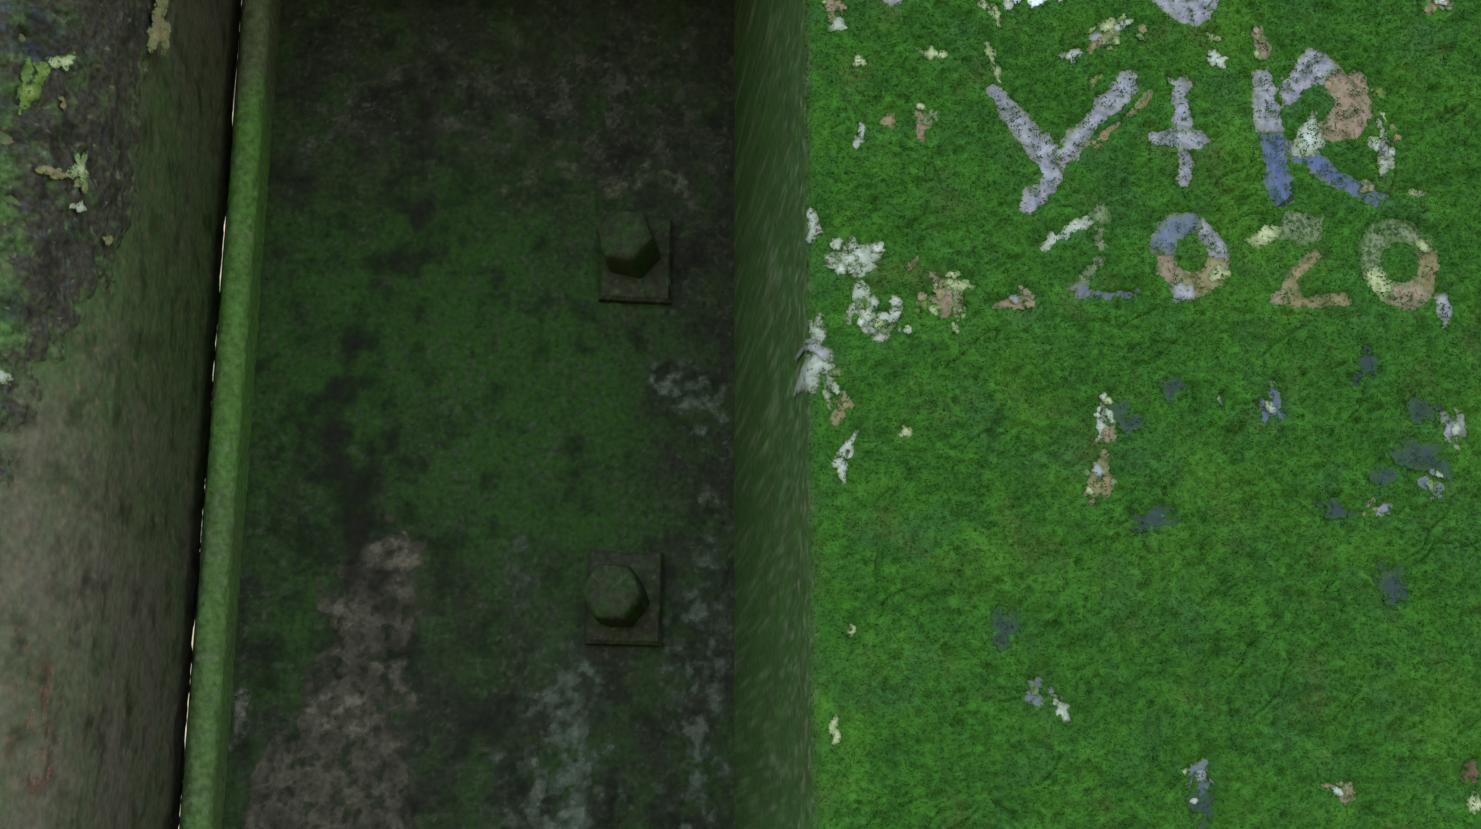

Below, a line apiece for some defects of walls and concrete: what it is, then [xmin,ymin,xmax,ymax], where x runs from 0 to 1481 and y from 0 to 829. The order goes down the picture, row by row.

flaking render [821,0,848,32]
peeling [979,0,1061,11]
peeling [1152,0,1219,27]
flaking render [1057,19,1147,63]
peeling [1206,49,1229,69]
flaking render [1251,26,1272,61]
peeling [1352,118,1402,200]
peeling [806,207,964,343]
flaking render [992,285,1035,311]
peeling [1070,283,1094,299]
peeling [793,310,858,485]